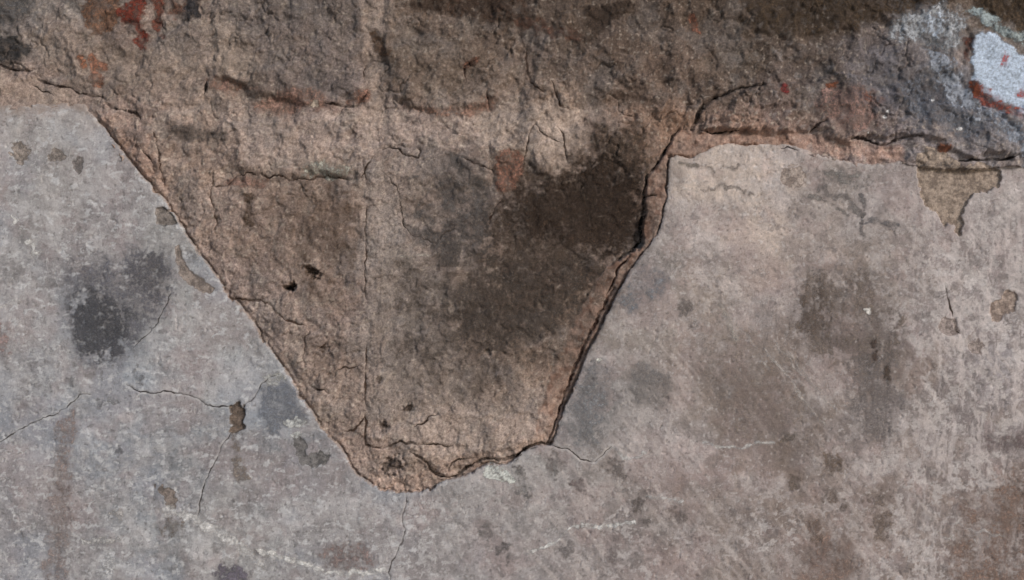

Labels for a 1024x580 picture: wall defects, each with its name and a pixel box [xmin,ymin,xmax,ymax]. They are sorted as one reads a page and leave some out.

flaking render [81,0,185,50]
peeling [890,1,1024,157]
flaking render [816,86,883,132]
spalling [8,141,31,165]
spalling [48,147,84,174]
flaking render [916,146,1001,236]
spalling [88,76,793,493]
crack [209,84,763,535]
flaking render [939,317,959,336]
flaking render [991,290,1017,322]
crack [0,394,91,442]
crack [133,388,229,408]